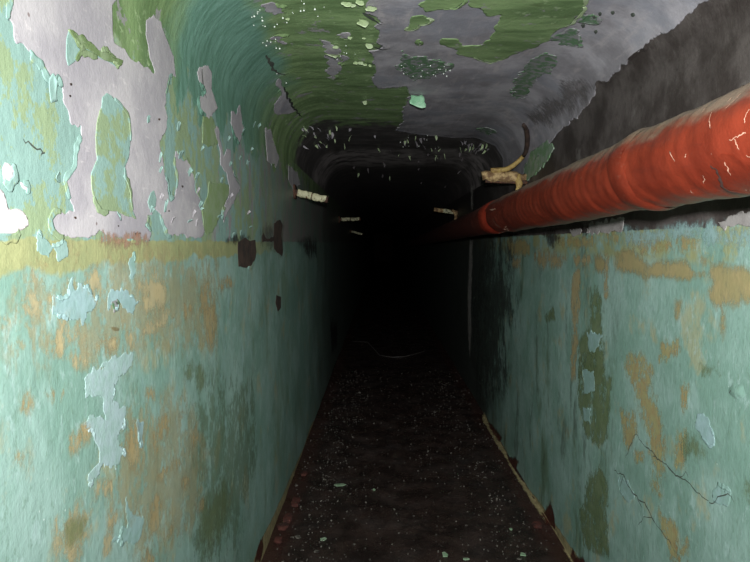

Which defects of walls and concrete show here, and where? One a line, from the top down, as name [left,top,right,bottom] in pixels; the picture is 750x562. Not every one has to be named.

crack [265,54,285,75]
peeling [321,0,708,181]
peeling [6,0,250,279]
peeling [254,121,279,168]
peeling [302,126,351,149]
peeling [0,163,31,245]
spalling [228,220,283,271]
spalling [52,277,139,326]
spalling [82,352,134,488]
spalling [695,413,715,449]
crack [628,434,734,504]
crack [614,470,675,552]